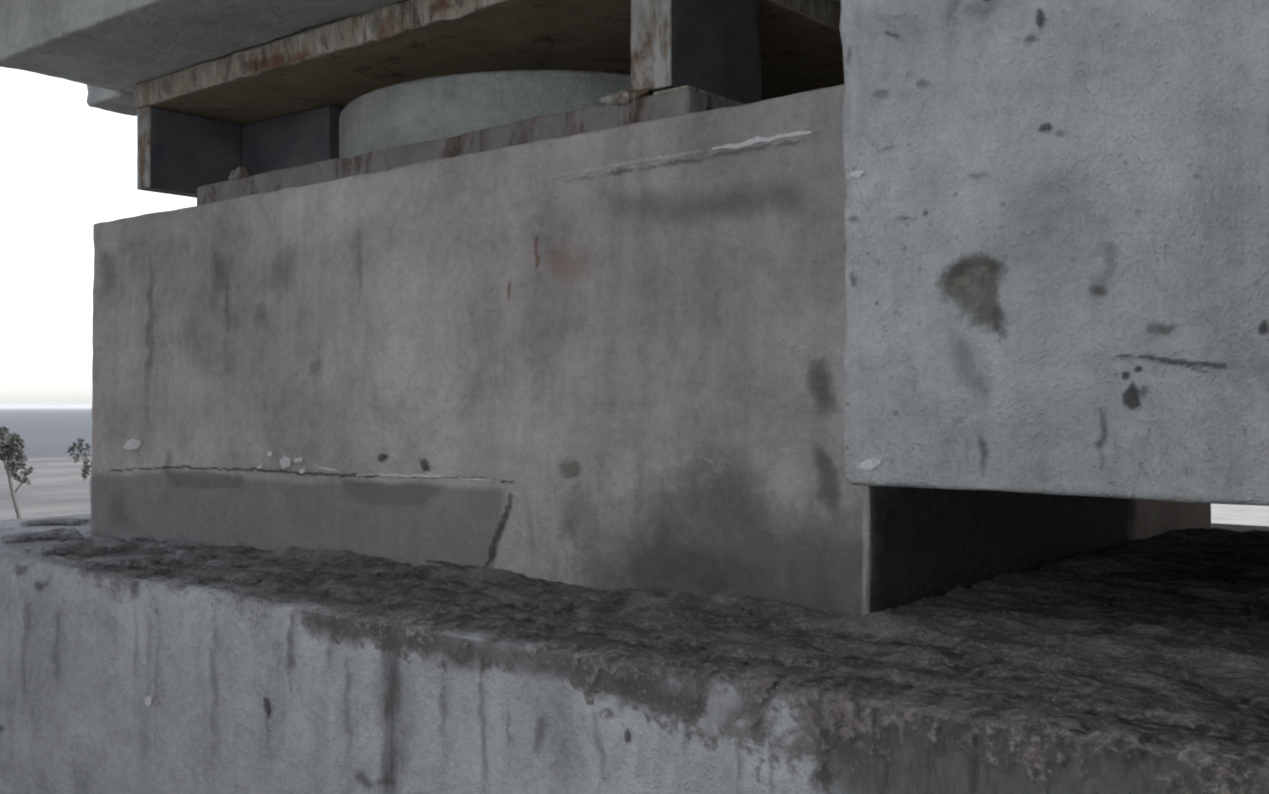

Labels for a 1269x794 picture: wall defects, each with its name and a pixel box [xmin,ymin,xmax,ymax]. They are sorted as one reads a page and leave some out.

leakage [596,485,1133,613]